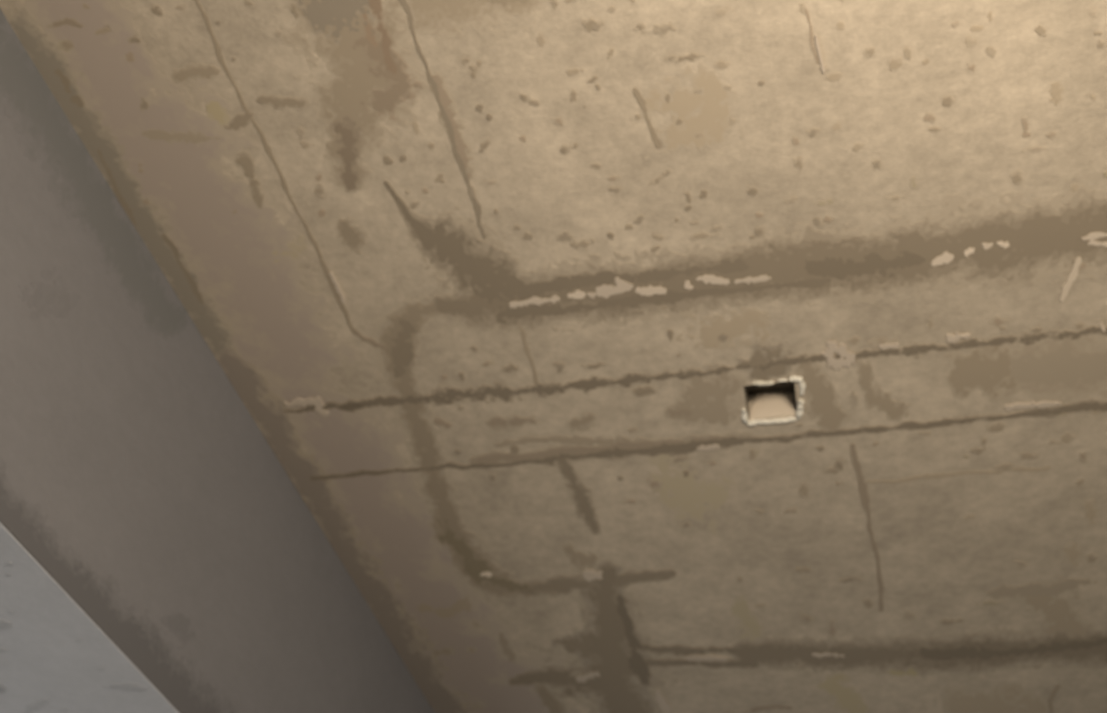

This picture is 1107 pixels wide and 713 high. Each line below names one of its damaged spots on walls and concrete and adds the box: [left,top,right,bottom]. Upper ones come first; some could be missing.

crack [195,0,386,350]
crack [399,0,486,239]
damp [0,0,568,713]
damp [469,412,755,535]
crack [282,323,1107,414]
crack [310,398,1107,612]
damp [374,180,1107,468]
damp [508,542,1107,713]